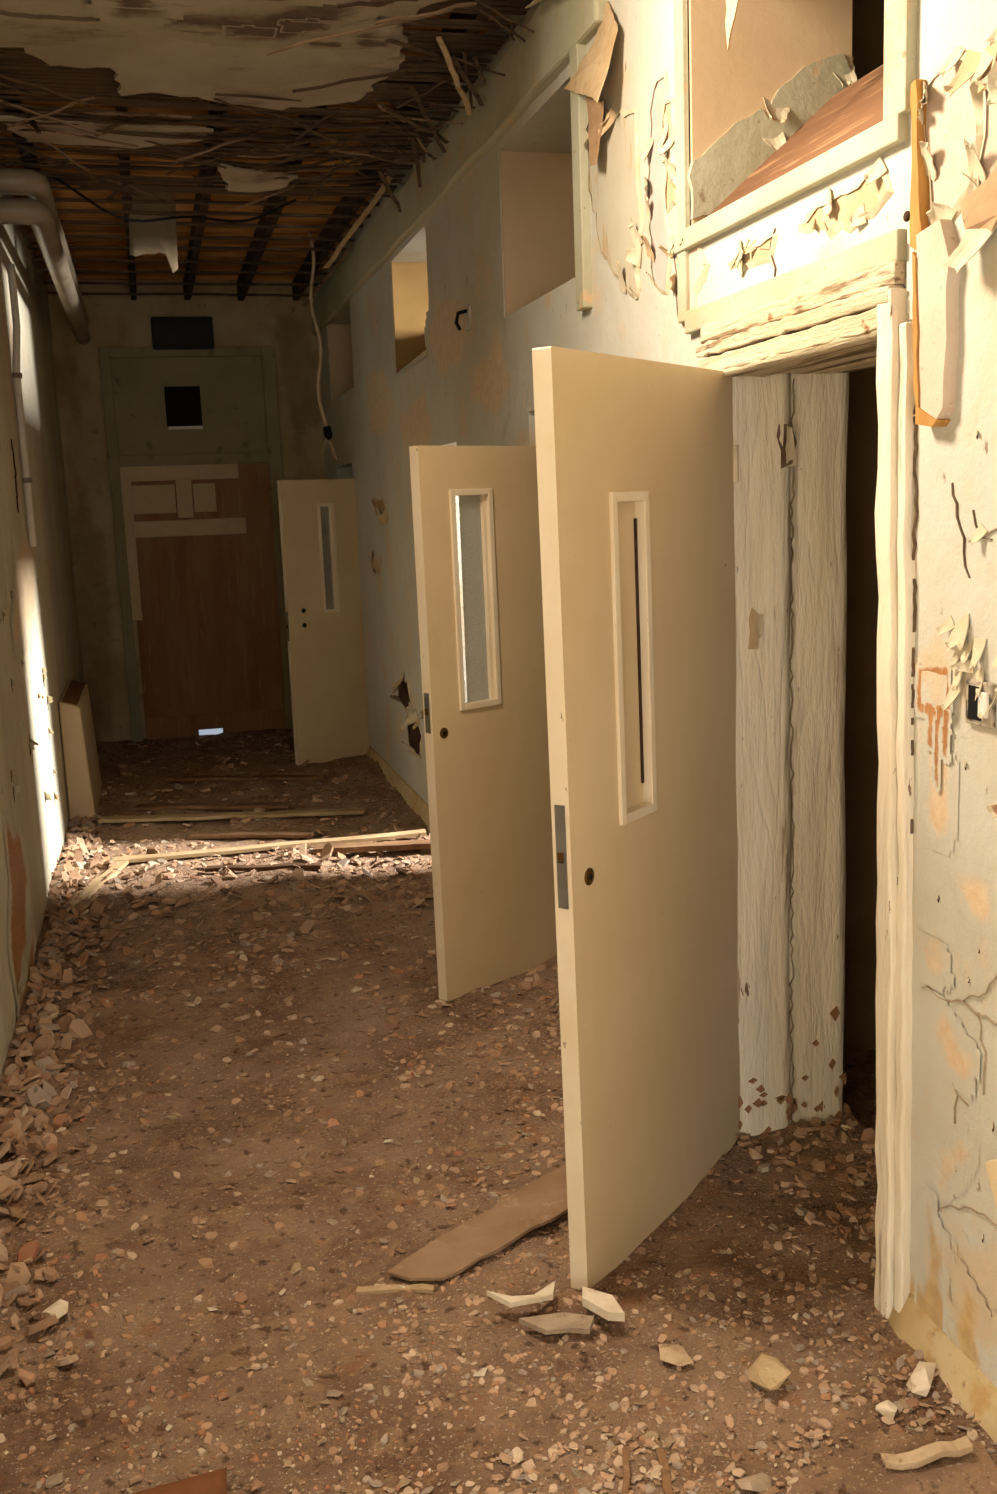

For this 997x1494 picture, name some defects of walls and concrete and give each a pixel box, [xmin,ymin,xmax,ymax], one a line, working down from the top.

damp [85,0,403,66]
peeling [725,0,739,50]
peeling [564,1,710,328]
peeling [798,156,894,239]
peeling [917,28,997,274]
peeling [728,233,778,278]
peeling [29,727,54,756]
corrosion [913,661,955,793]
crack [922,974,997,1124]
peeling [738,1058,851,1134]
crack [937,1205,997,1226]
damp [910,1184,997,1388]